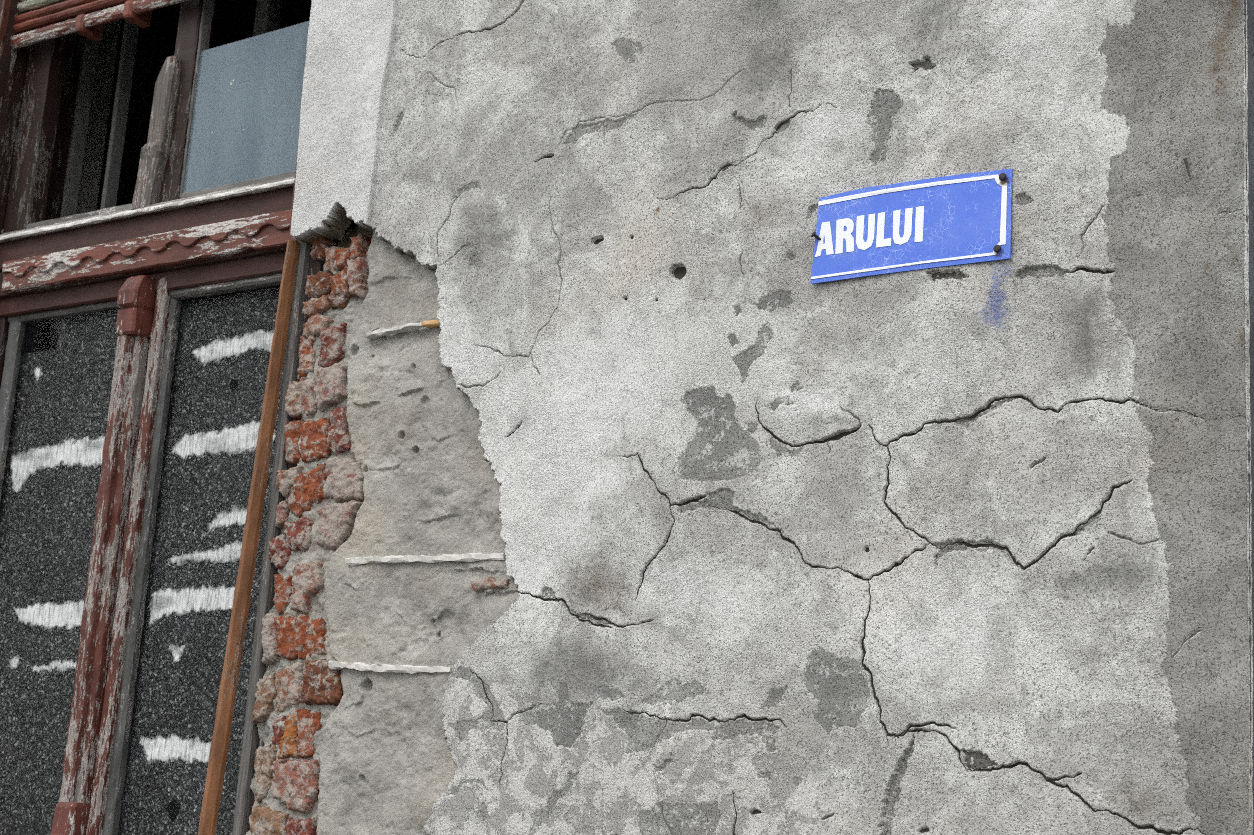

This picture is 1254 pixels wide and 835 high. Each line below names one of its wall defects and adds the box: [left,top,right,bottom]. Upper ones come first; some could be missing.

crack [401,15,513,101]
crack [663,69,837,208]
peeling [868,90,902,166]
crack [459,197,563,388]
peeling [678,386,804,529]
peeling [727,290,793,384]
peeling [771,381,803,411]
crack [1068,206,1114,274]
peeling [1098,0,1249,835]
spalling [246,225,519,835]
crack [516,396,1246,835]
crack [469,667,536,788]